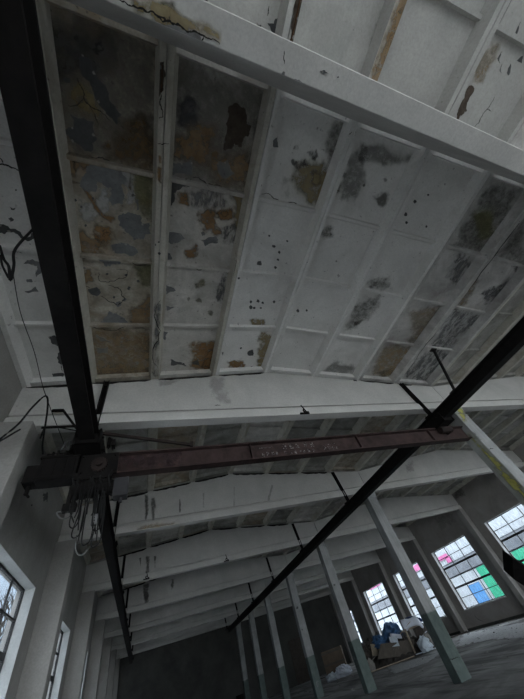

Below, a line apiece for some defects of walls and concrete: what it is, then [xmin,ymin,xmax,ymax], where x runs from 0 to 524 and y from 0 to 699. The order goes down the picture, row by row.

crack [120,0,220,44]
rust [372,0,407,81]
spalling [457,85,474,119]
spalling [223,103,251,152]
peeling [171,179,225,208]
water stain [292,163,327,204]
peeling [0,207,34,241]
peeling [80,165,151,275]
water stain [373,307,438,377]